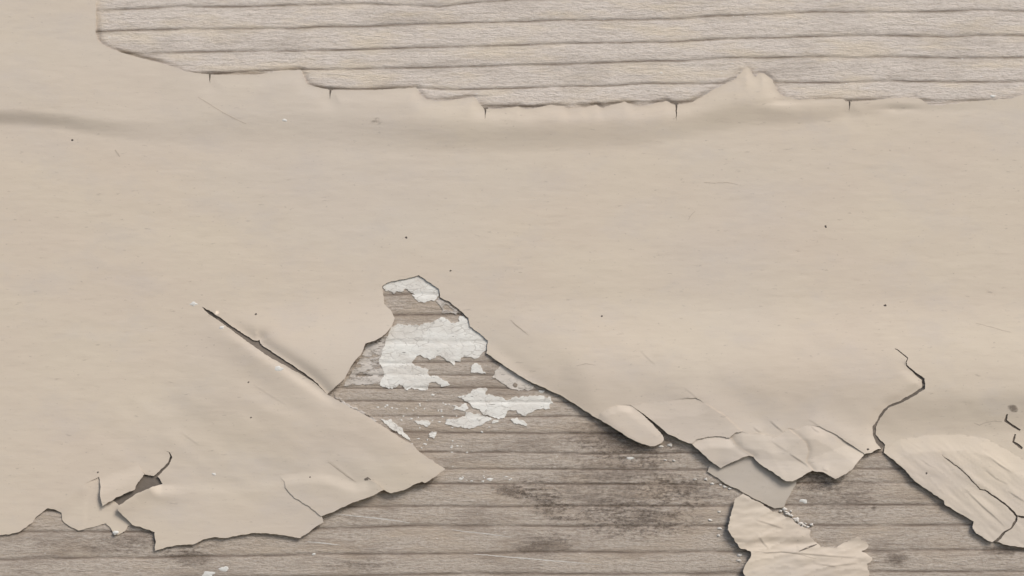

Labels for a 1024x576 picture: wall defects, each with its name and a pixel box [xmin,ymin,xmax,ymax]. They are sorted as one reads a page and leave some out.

peeling [95,0,1024,109]
crack [203,307,317,384]
peeling [0,275,1024,576]
crack [872,349,925,450]